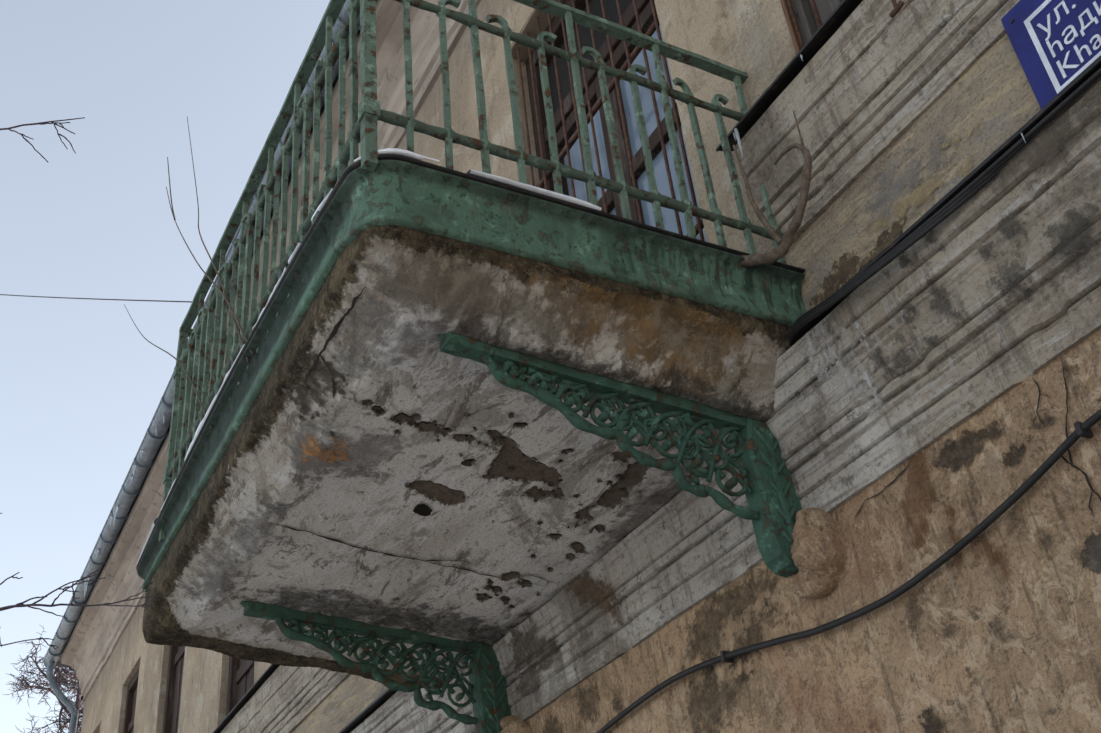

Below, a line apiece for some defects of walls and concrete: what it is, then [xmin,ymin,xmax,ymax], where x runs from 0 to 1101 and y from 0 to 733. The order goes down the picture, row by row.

crack [305,287,366,399]
spalling [280,343,651,562]
crack [1032,358,1101,517]
crack [265,520,555,587]
peeling [476,571,541,609]
flaking render [1081,532,1101,573]